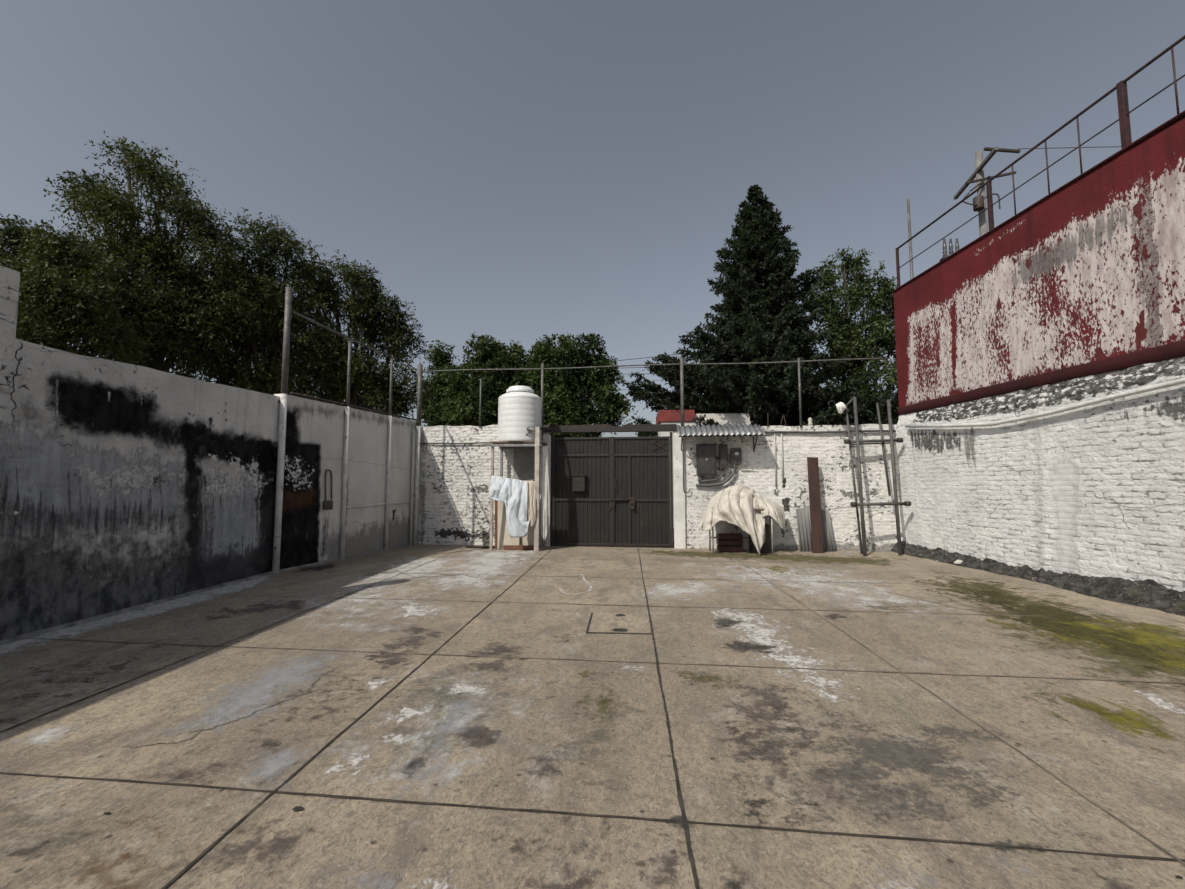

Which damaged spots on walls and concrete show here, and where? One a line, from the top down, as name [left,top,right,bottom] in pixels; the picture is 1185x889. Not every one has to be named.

peeling [906,157,1185,406]
crack [0,318,122,463]
leakage [0,395,186,554]
leakage [200,471,266,556]
peeling [433,444,490,545]
leakage [0,486,543,730]
leakage [30,727,69,743]
crack [119,669,334,748]
leakage [250,741,302,784]
leakage [1134,690,1185,714]